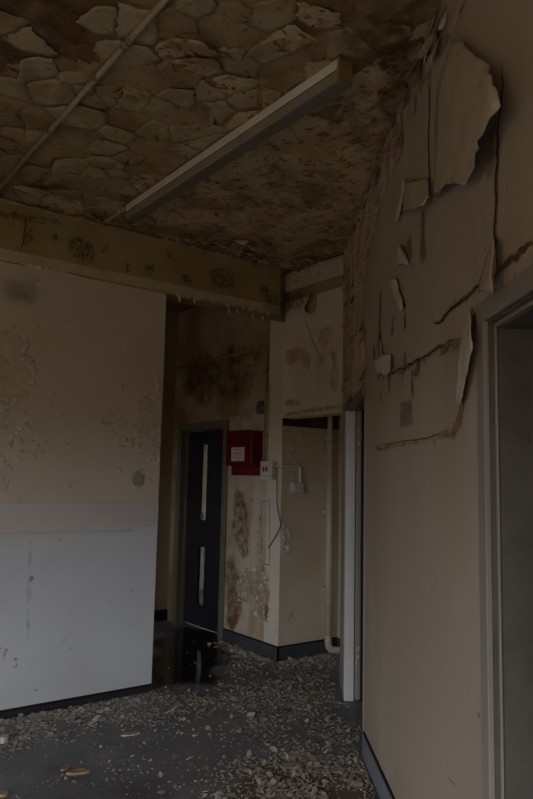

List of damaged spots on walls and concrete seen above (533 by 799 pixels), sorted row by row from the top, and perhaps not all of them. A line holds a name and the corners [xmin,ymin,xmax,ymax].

peeling [0,0,443,269]
crack [493,66,533,274]
crack [432,283,479,325]